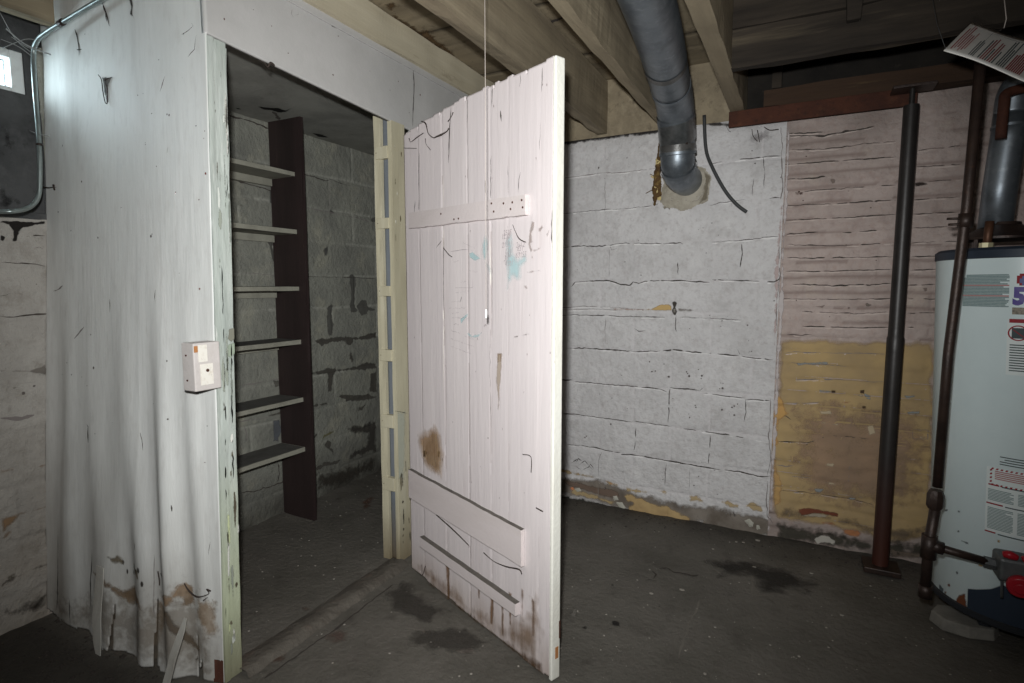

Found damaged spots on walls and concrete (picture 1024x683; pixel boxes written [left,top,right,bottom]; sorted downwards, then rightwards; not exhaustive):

peeling [561,341,886,536]
peeling [890,343,933,541]
damp [95,568,139,606]
damp [163,583,194,611]
damp [716,562,799,591]